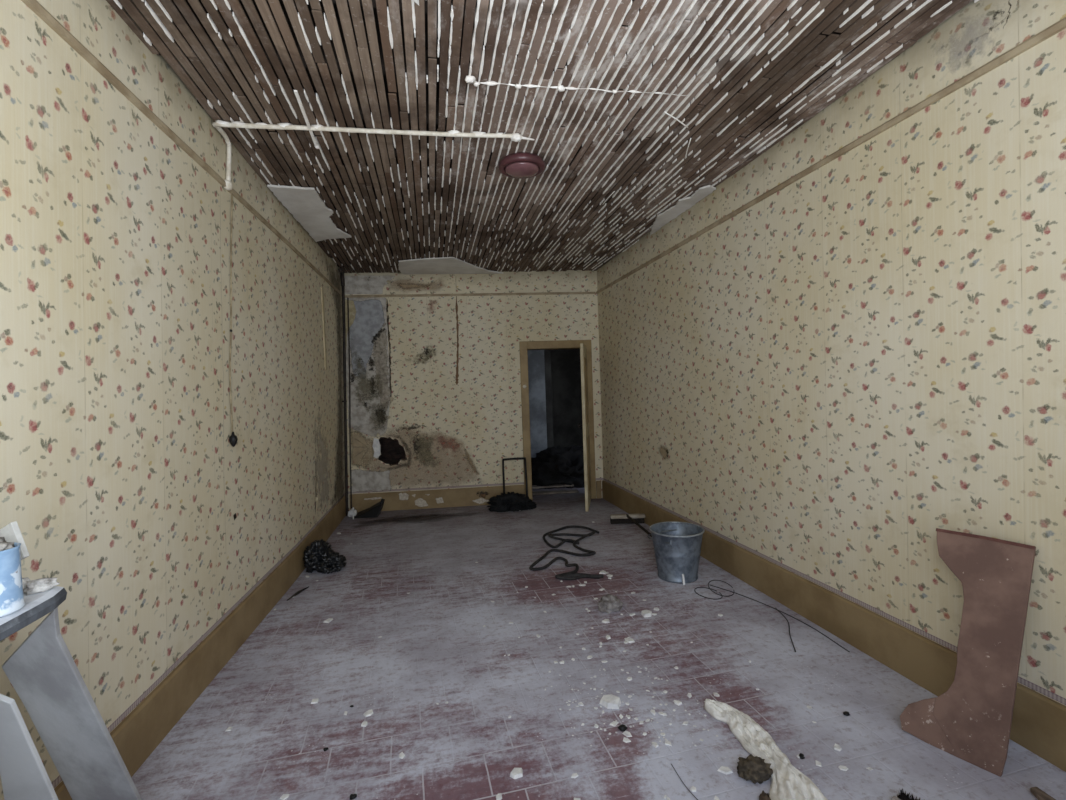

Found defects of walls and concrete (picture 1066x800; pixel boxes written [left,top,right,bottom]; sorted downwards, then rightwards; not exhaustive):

flaking render [294,90,319,149]
flaking render [267,185,352,242]
flaking render [650,185,716,235]
flaking render [398,257,503,274]
flaking render [349,300,384,378]
leakage [327,267,387,502]
spalling [372,437,411,469]